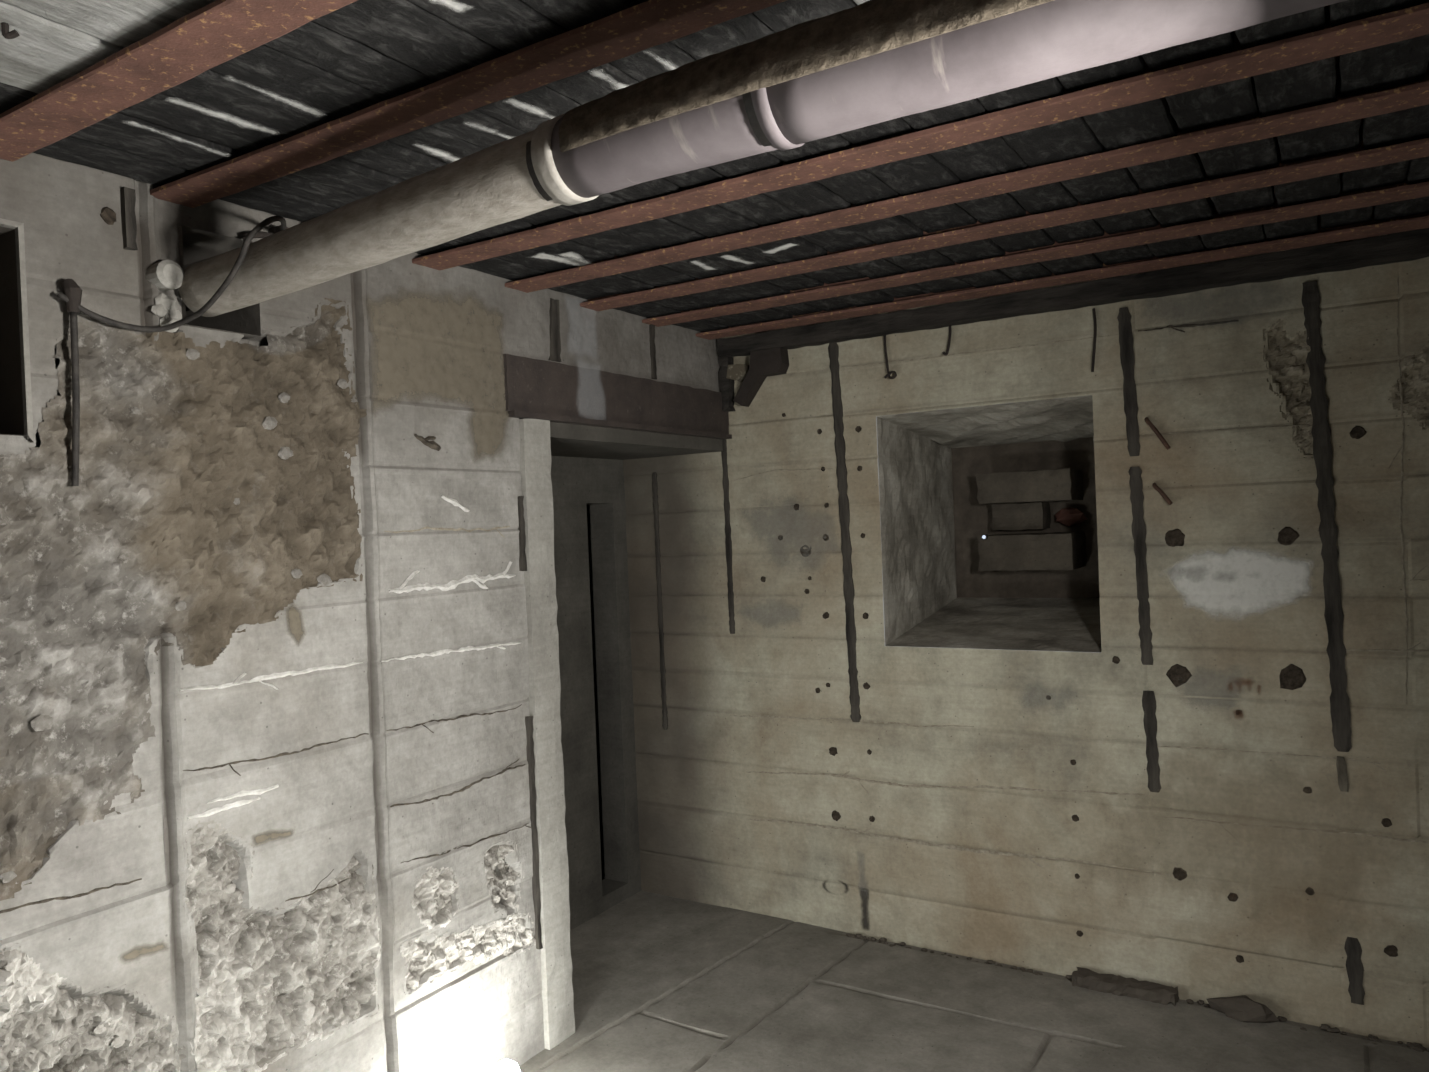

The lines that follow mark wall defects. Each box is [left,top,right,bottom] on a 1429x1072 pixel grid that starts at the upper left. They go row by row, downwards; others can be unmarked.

spalling [1263,319,1314,458]
spalling [0,293,509,901]
spalling [0,820,381,1072]
spalling [400,837,536,995]